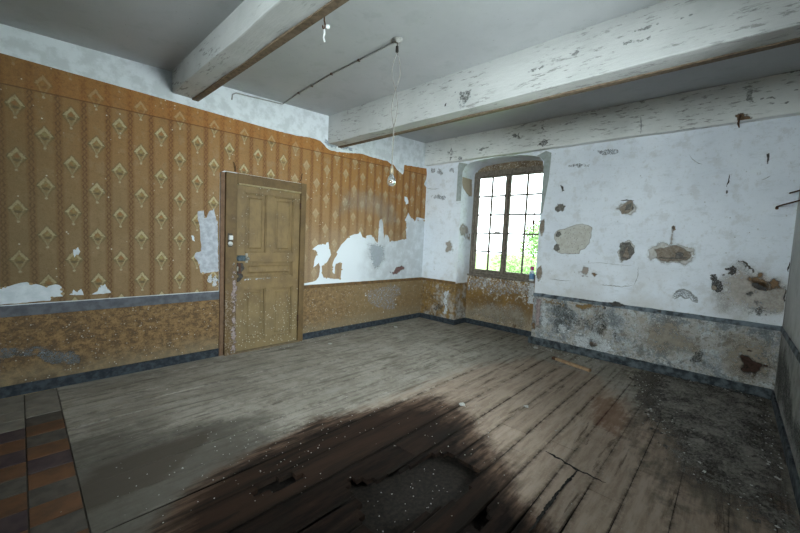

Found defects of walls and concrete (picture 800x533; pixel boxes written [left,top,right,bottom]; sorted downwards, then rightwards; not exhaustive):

flaking render [619,200,636,215]
flaking render [554,224,592,254]
flaking render [618,240,635,261]
flaking render [649,243,694,265]
peeling [722,261,773,291]
leakage [540,304,616,339]